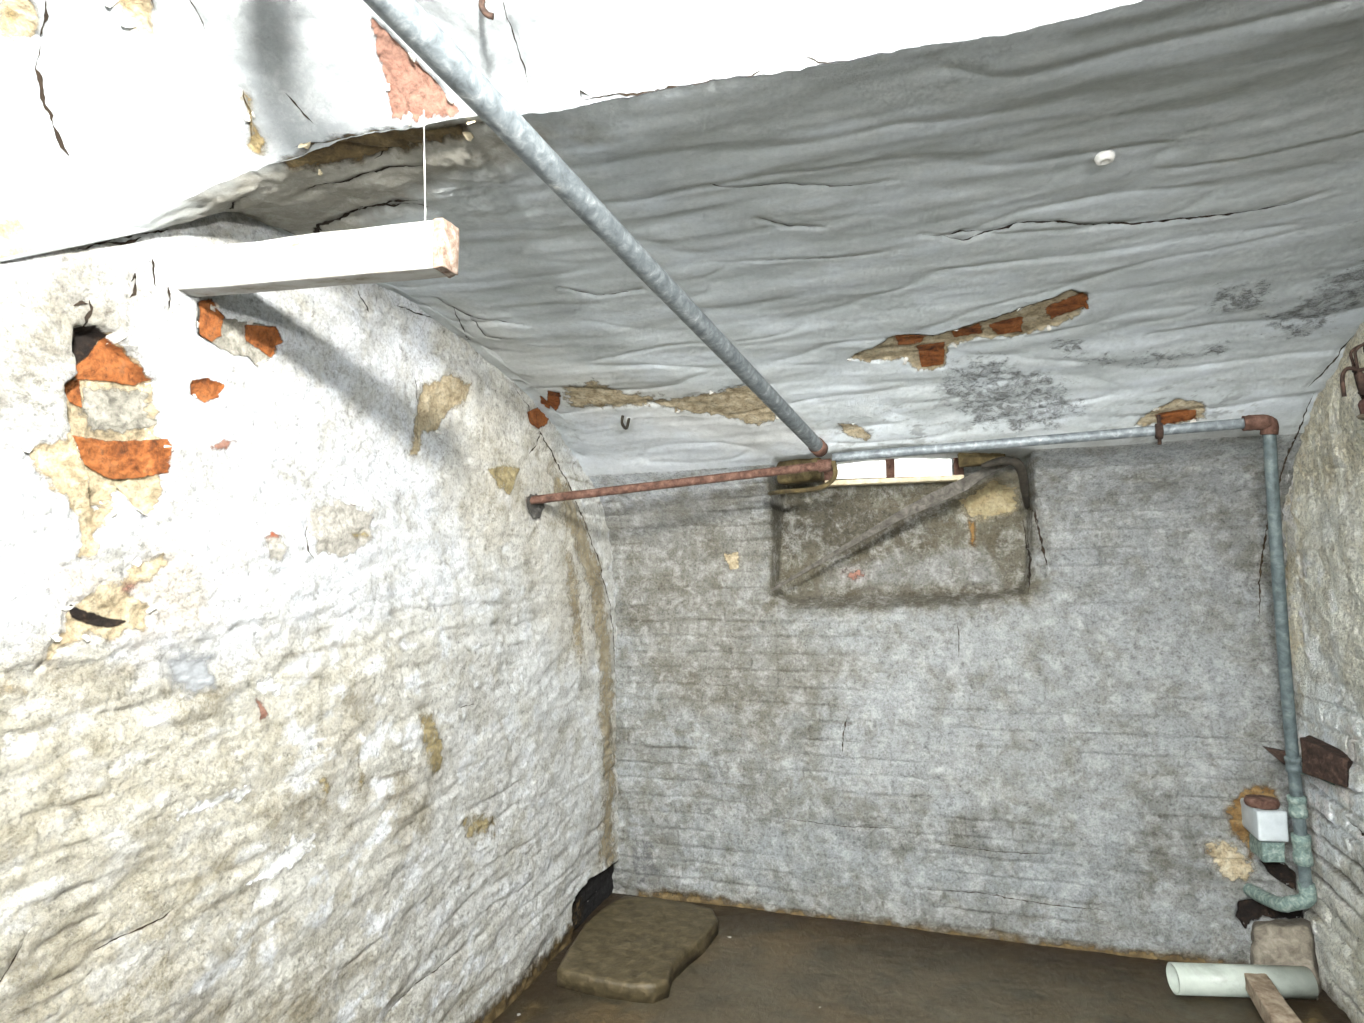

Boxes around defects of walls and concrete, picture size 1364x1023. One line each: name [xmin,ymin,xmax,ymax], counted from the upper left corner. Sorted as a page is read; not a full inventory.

crack [35,1,70,157]
peeling [243,93,265,155]
spalling [279,18,483,176]
spalling [847,290,1089,371]
spalling [21,325,174,558]
flaking render [410,374,472,455]
spalling [527,391,561,429]
peeling [648,385,779,426]
peeling [45,553,168,661]